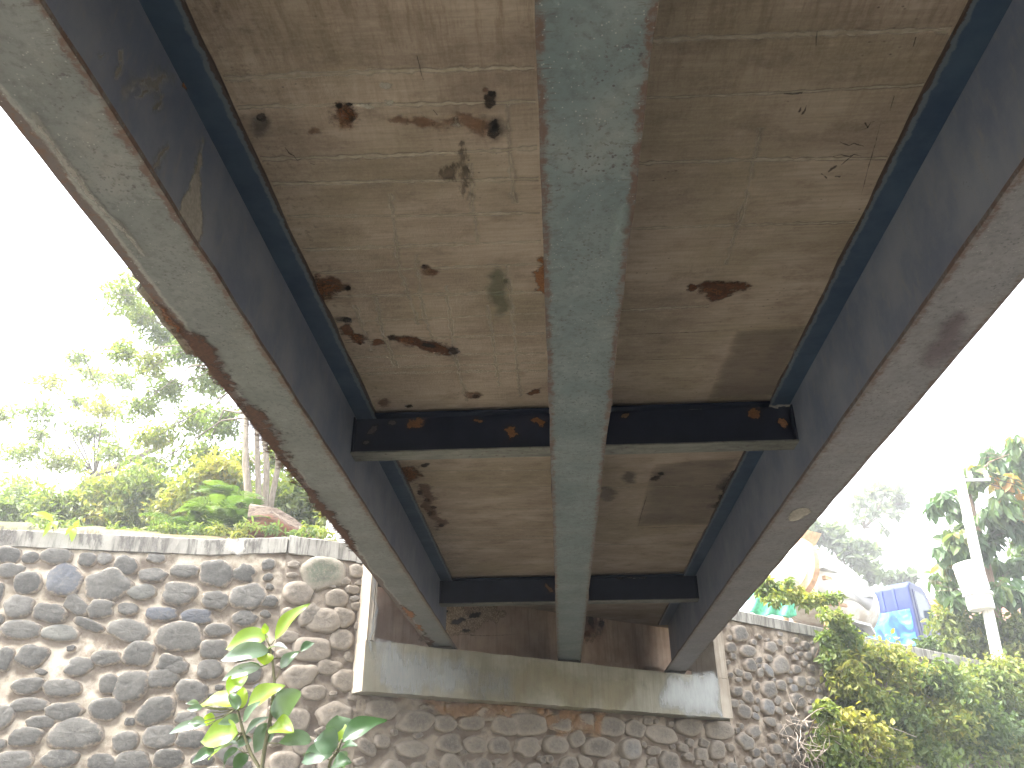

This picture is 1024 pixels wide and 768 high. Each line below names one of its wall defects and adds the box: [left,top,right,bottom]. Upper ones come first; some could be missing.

rust [335,103,357,128]
rust [390,114,487,136]
rust [314,274,351,300]
leakage [489,269,509,313]
rust [532,256,544,293]
rust [150,302,357,552]
rust [402,463,430,482]